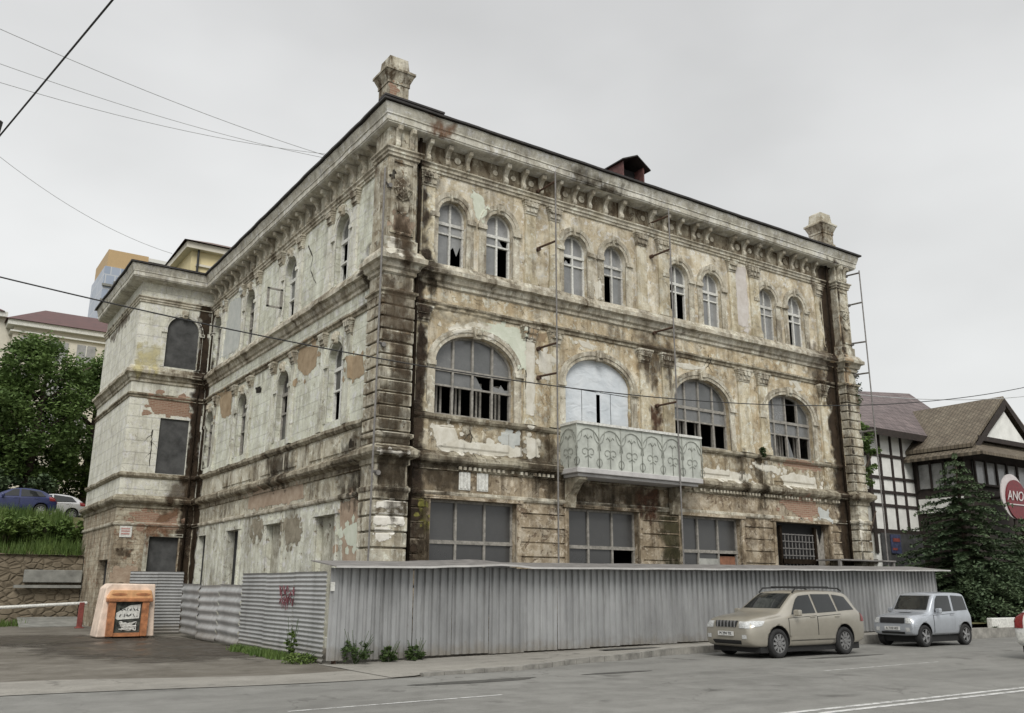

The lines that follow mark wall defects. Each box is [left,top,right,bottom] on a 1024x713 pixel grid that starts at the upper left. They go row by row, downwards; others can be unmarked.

flaking render [142,390,194,419]
flaking render [214,387,232,419]
flaking render [288,337,321,386]
flaking render [342,350,366,384]
damp [378,159,462,561]
flaking render [430,311,556,459]
damp [167,304,215,628]
flaking render [243,481,304,552]
flaking render [333,487,360,561]
flaking render [373,497,430,542]
damp [659,514,682,564]
flaking render [701,459,833,524]